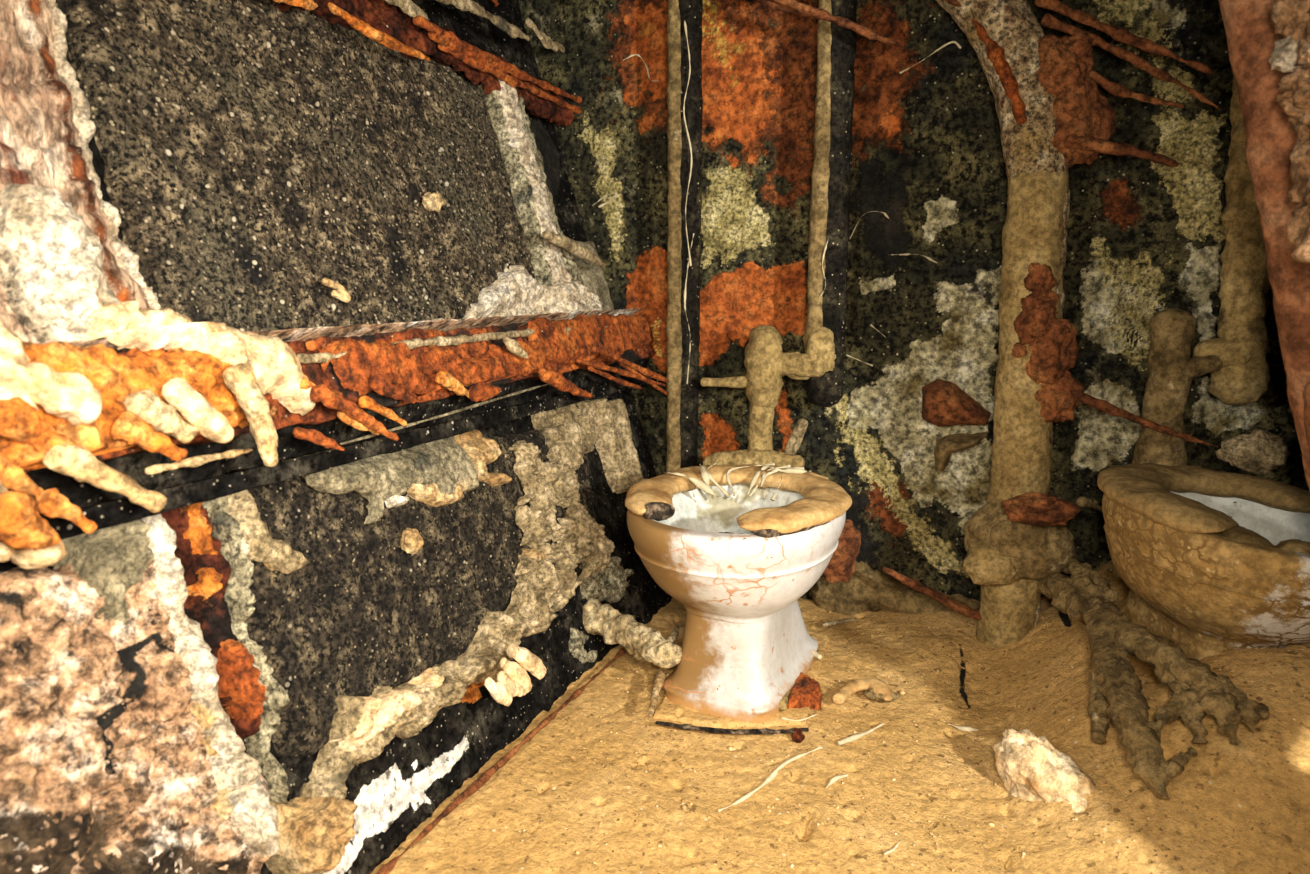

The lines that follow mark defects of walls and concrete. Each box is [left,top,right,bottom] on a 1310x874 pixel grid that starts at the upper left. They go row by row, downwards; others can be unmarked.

rust [27,0,140,309]
rust [327,2,430,62]
rust [601,0,668,142]
rust [701,0,935,209]
spalling [0,268,42,339]
rust [299,246,668,441]
rust [699,260,807,366]
rust [0,341,250,569]
rust [293,427,344,451]
peeling [52,519,155,625]
peeling [183,502,223,601]
rust [216,639,267,722]